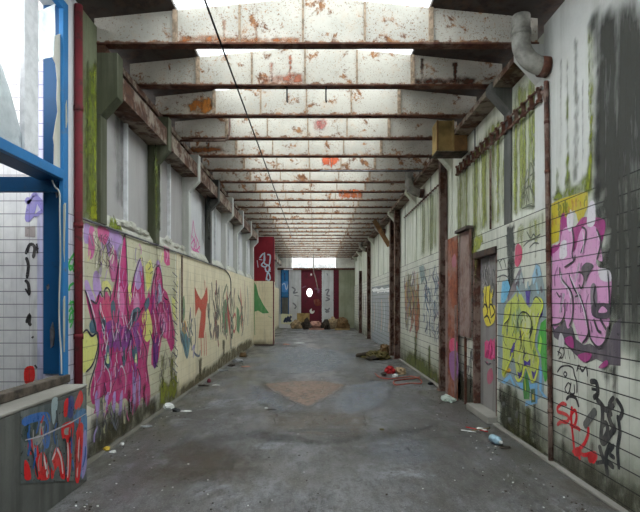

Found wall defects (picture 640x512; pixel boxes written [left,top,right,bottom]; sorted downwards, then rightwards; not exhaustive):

rust [277,55,302,83]
rust [415,58,475,84]
rust [188,96,212,114]
rust [190,142,222,153]
water stain [514,110,535,192]
water stain [588,5,640,347]
water stain [181,340,252,395]
water stain [91,385,156,451]
water stain [499,386,541,446]